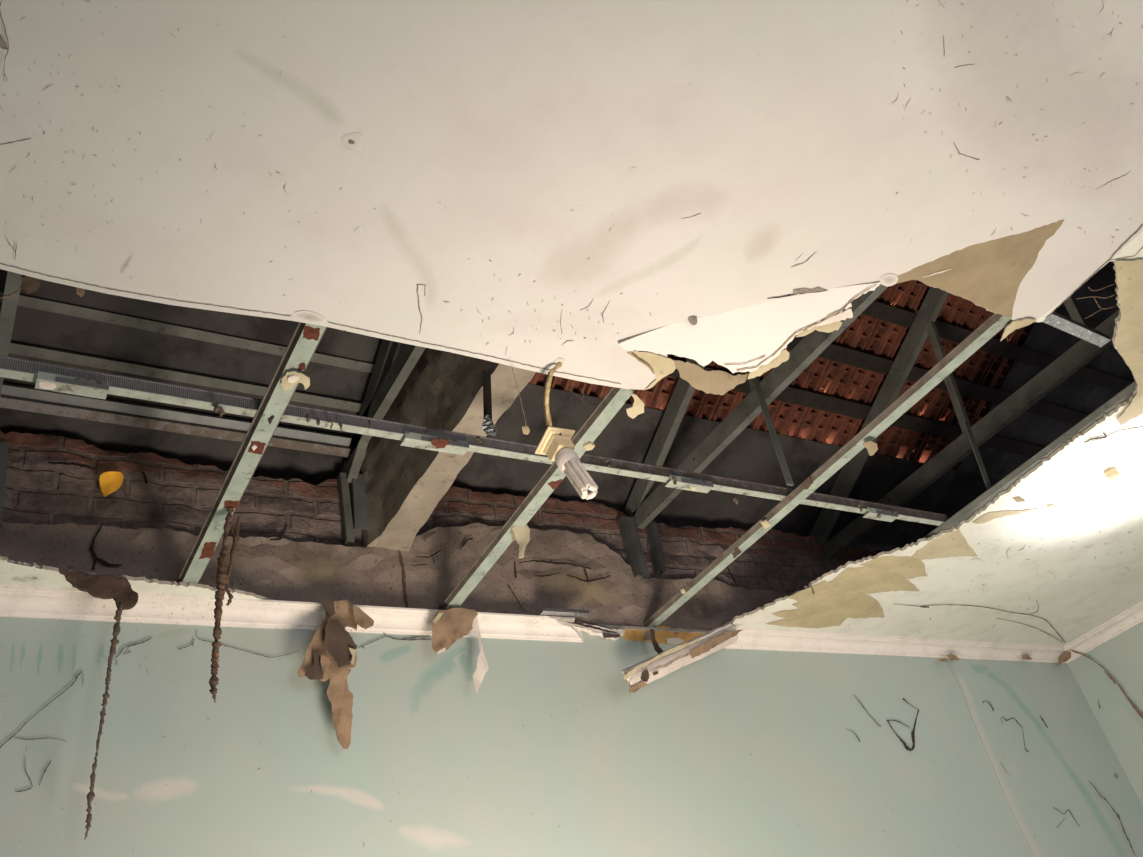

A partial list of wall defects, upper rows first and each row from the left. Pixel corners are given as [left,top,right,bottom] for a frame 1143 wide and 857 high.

peeling [896,219,1064,318]
peeling [39,381,57,390]
corrosion [248,441,266,455]
peeling [972,509,1034,524]
corrosion [199,542,217,559]
peeling [766,528,977,629]